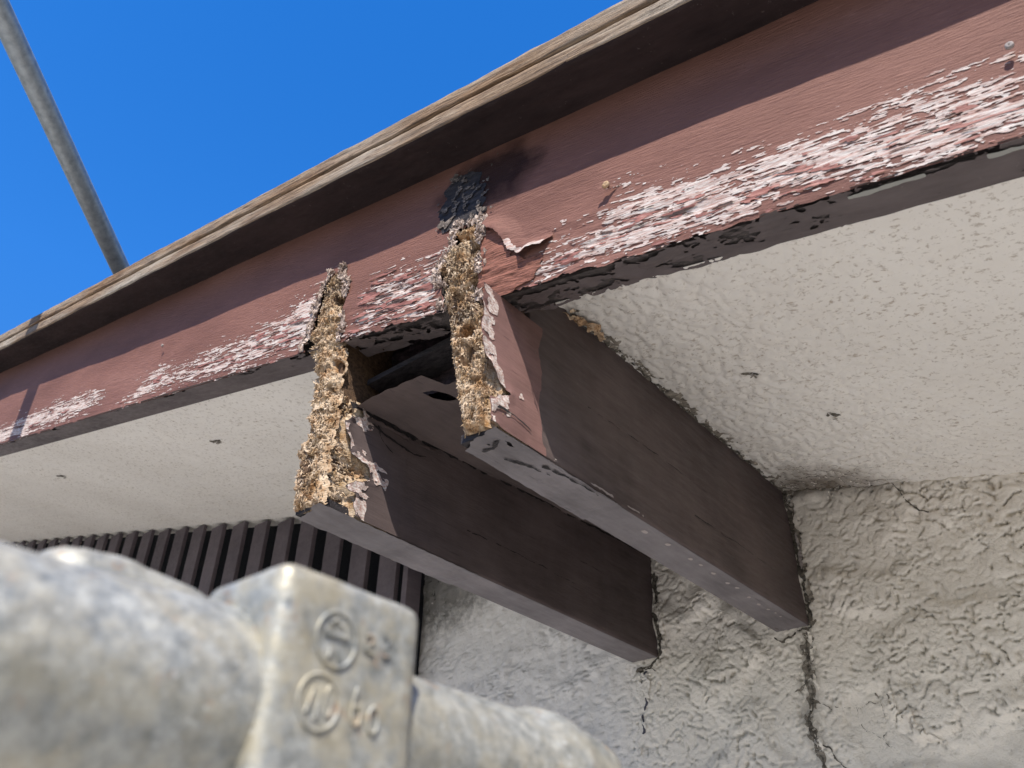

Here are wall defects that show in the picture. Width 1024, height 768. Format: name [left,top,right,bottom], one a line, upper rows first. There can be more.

peeling [528,51,1024,287]
peeling [117,273,325,407]
peeling [0,385,106,444]
crack [563,308,846,768]
crack [871,484,929,513]